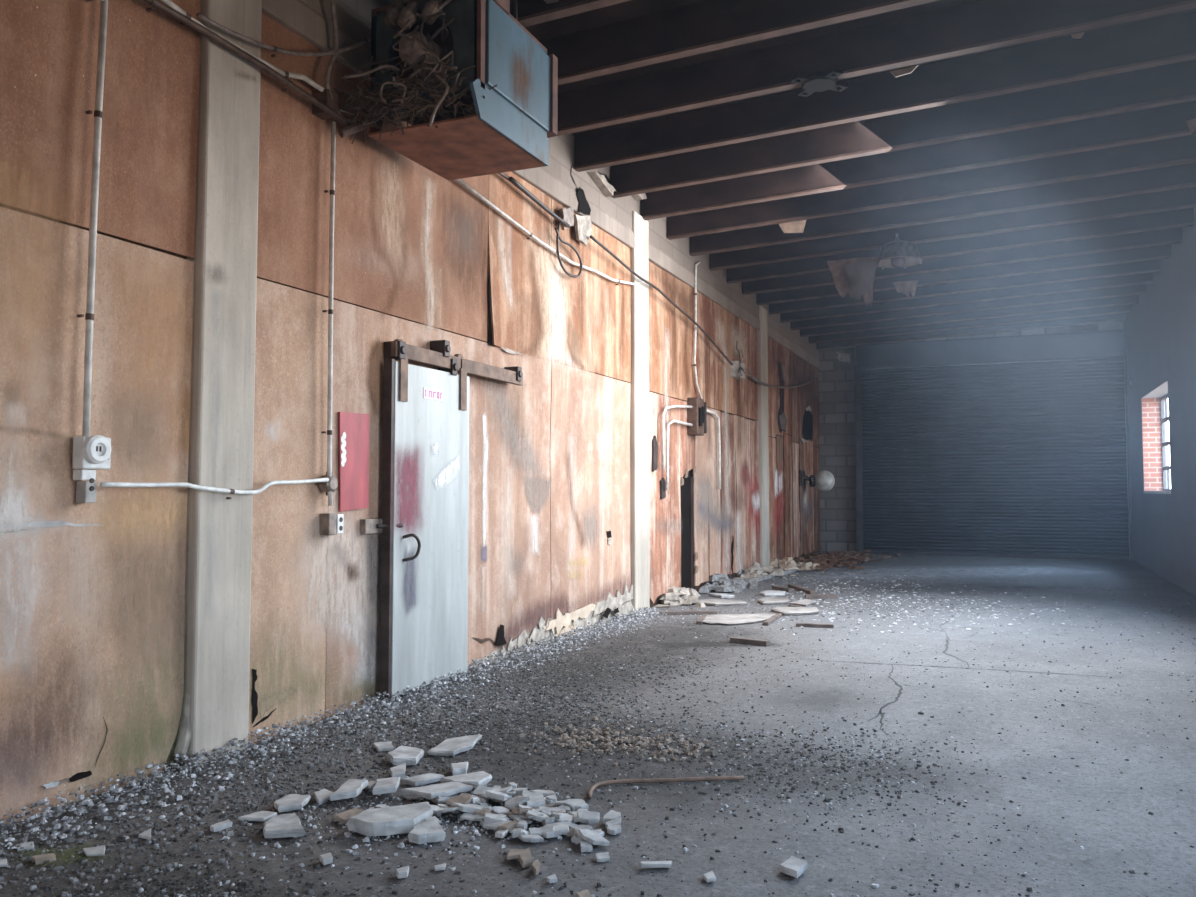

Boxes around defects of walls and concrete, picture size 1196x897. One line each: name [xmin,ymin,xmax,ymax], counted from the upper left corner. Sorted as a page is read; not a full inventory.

water stain [425,183,434,329]
water stain [498,224,513,305]
water stain [534,239,591,370]
crack [805,615,1120,737]